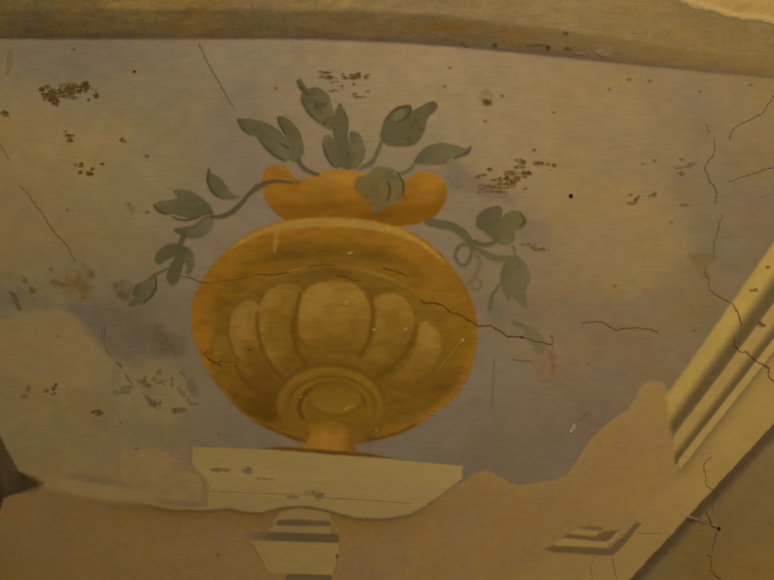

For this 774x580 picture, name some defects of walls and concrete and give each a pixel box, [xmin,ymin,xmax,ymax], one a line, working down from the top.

peeling [677,0,774,24]
peeling [38,81,99,107]
peeling [317,70,371,98]
peeling [474,158,556,194]
crack [704,94,774,382]
crack [181,264,361,284]
crack [420,299,554,348]
crack [583,321,658,332]
peeling [113,369,199,415]
flaking render [0,380,679,580]
crack [703,456,722,580]